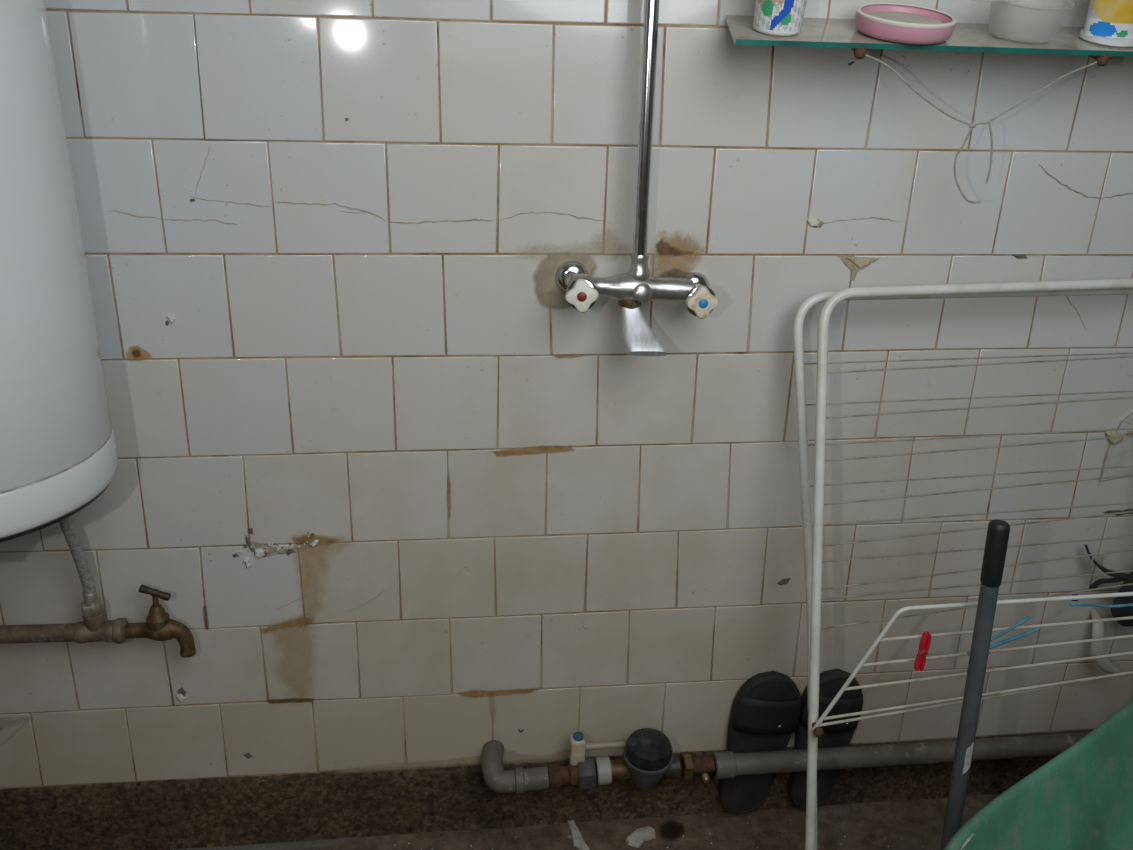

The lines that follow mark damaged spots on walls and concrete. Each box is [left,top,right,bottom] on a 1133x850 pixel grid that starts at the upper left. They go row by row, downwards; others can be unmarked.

crack [113,145,600,225]
leakage [535,237,619,309]
corrosion [127,347,150,360]
corrosion [494,446,574,456]
spalling [232,528,319,567]
corrosion [460,688,538,714]